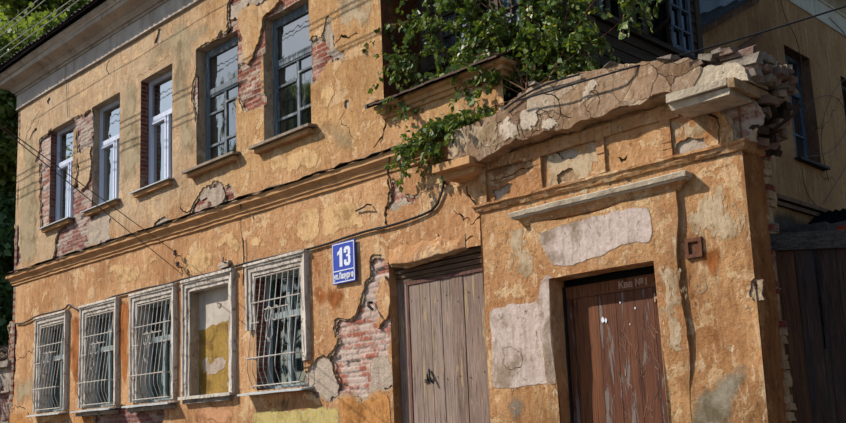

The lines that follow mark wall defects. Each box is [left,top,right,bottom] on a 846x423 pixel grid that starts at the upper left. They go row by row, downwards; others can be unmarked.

spalling [196,0,300,113]
spalling [310,15,345,108]
spalling [657,54,680,62]
crack [510,84,574,140]
spalling [30,128,53,228]
spalling [52,109,112,261]
spalling [189,180,237,216]
peeling [270,148,319,172]
crack [421,183,480,242]
peeling [547,141,598,195]
spalling [302,254,396,403]
spalling [93,404,165,423]